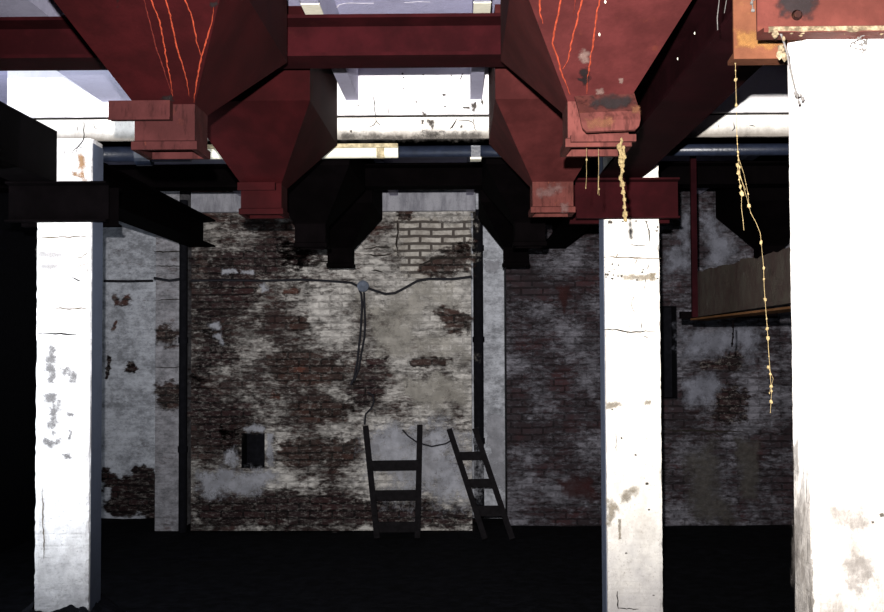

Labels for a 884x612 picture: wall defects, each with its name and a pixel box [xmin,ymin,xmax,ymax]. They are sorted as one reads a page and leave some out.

rust [144,0,214,100]
rust [552,0,583,94]
rust [738,33,779,47]
rust [73,153,85,181]
peeling [396,211,414,221]
crack [41,236,90,282]
peeling [417,239,477,284]
crack [37,330,77,338]
crack [52,304,89,312]
peeling [433,305,475,337]
peeling [409,356,453,368]
mould [42,342,77,459]